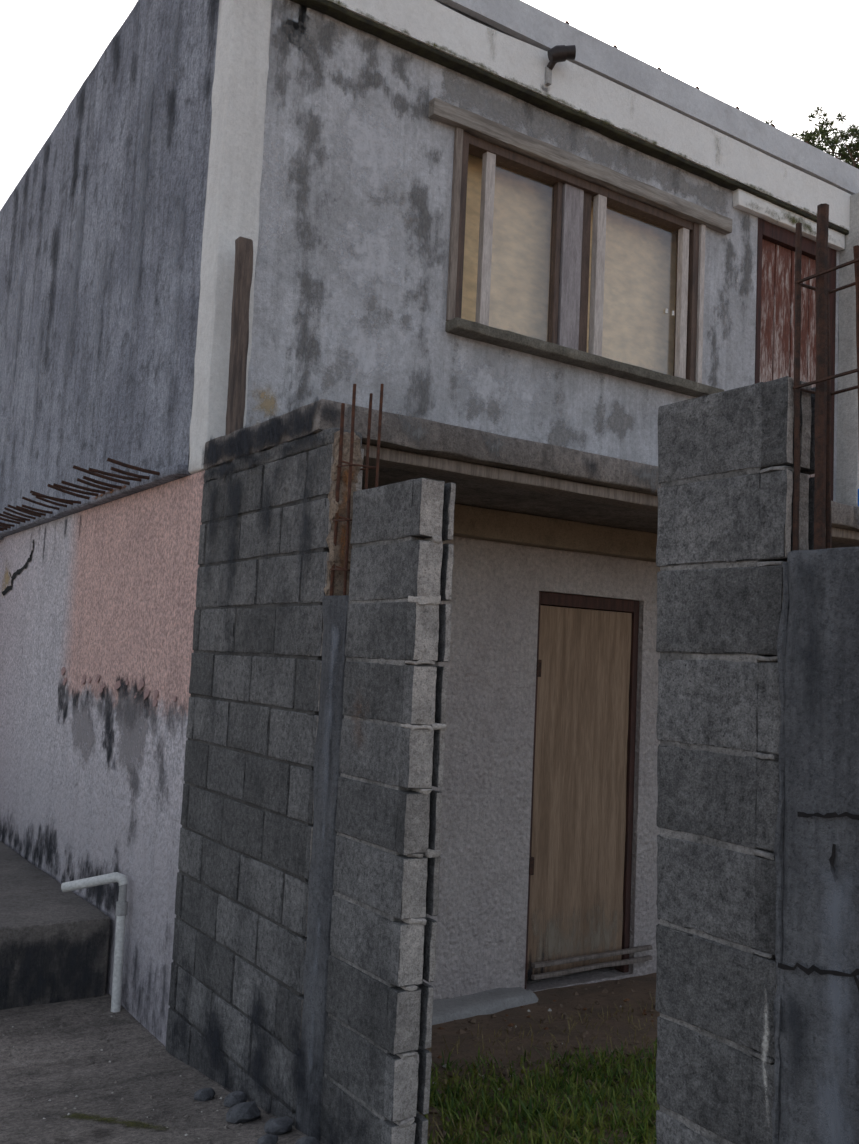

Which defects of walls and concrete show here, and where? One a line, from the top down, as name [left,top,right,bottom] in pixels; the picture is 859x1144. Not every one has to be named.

water stain [207,0,216,46]
water stain [272,0,431,119]
water stain [10,145,48,253]
water stain [69,84,86,197]
water stain [290,109,323,246]
water stain [405,185,441,263]
water stain [36,225,57,367]
water stain [548,402,633,446]
crack [2,540,34,596]
water stain [0,825,119,909]
water stain [0,931,106,1010]
crack [778,963,859,991]